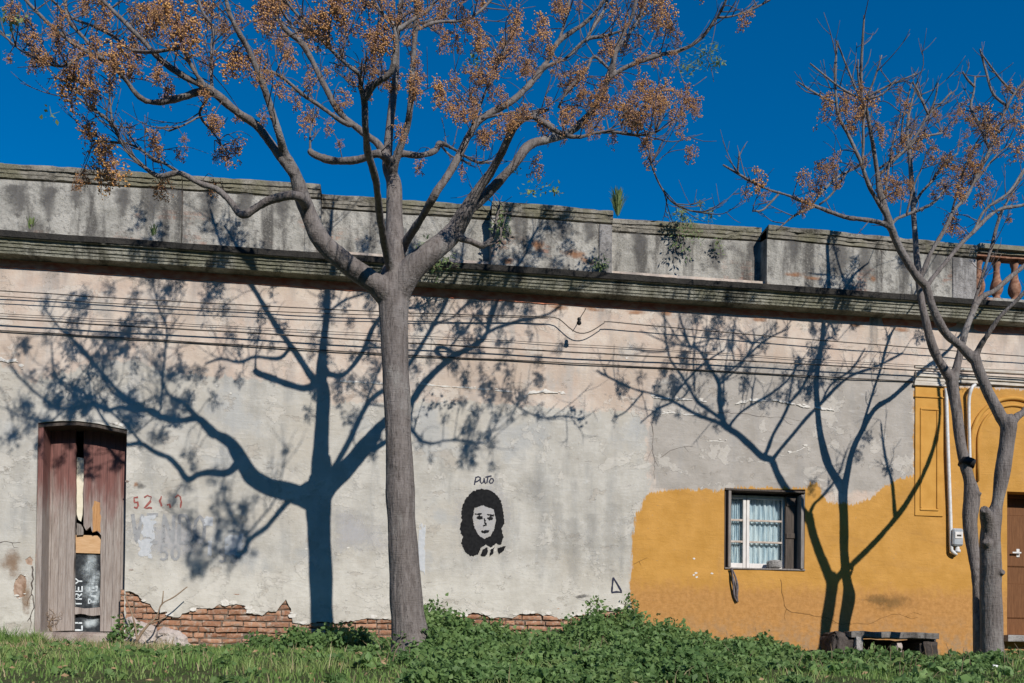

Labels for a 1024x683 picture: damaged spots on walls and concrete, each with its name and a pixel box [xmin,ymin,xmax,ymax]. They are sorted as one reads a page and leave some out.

damp [44,187,54,215]
damp [119,189,128,212]
damp [635,233,646,257]
spalling [13,557,36,599]
flaking render [120,590,391,648]
flaking render [457,608,584,635]